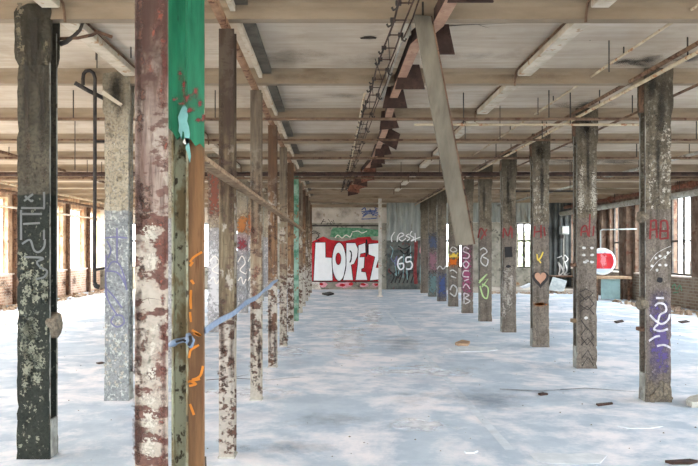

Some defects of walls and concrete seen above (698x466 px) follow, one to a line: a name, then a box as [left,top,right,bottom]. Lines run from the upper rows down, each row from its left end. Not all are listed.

leakage [110,76,121,100]
peeling [142,223,160,272]
peeling [143,323,160,384]
peeling [139,392,163,460]